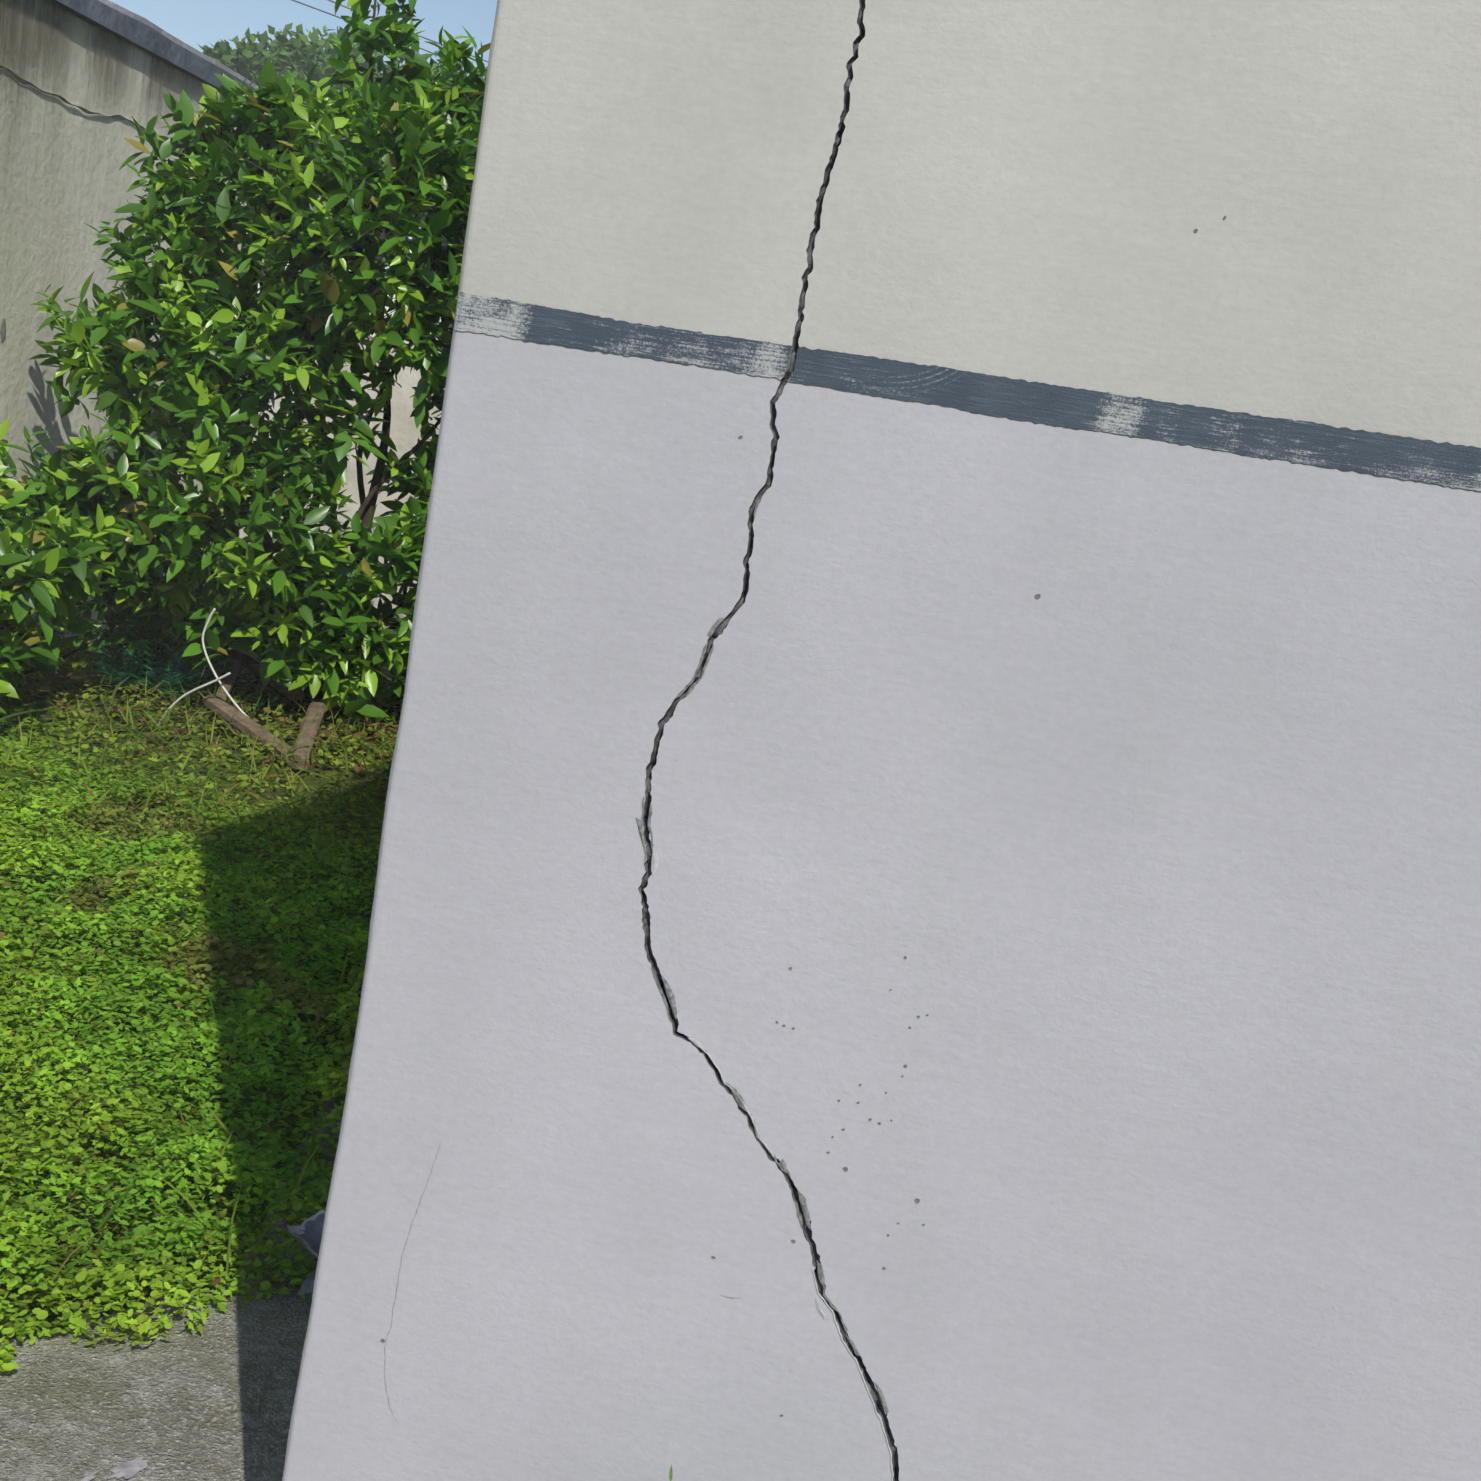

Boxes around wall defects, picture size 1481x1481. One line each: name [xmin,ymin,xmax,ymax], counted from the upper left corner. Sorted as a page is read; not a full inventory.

crack [636,0,899,1481]